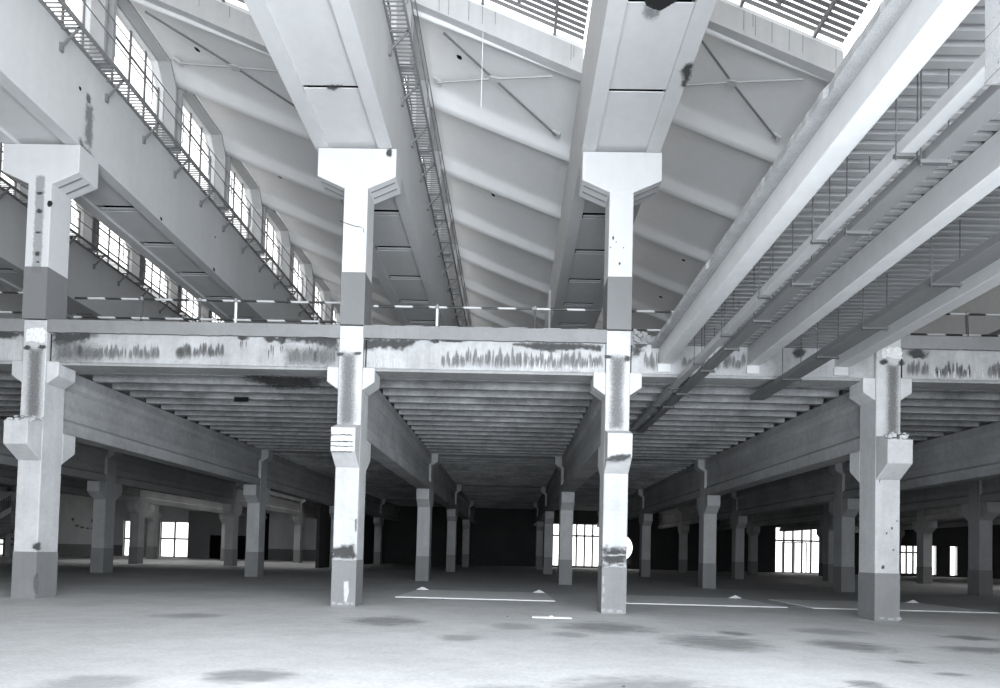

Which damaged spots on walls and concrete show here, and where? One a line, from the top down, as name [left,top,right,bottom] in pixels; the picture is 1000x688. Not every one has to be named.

spalling [628,0,692,11]
leakage [52,333,159,359]
leakage [176,343,224,356]
leakage [246,337,338,389]
leakage [364,339,419,368]
leakage [431,340,602,370]
spalling [881,347,903,359]
leakage [907,350,1000,379]